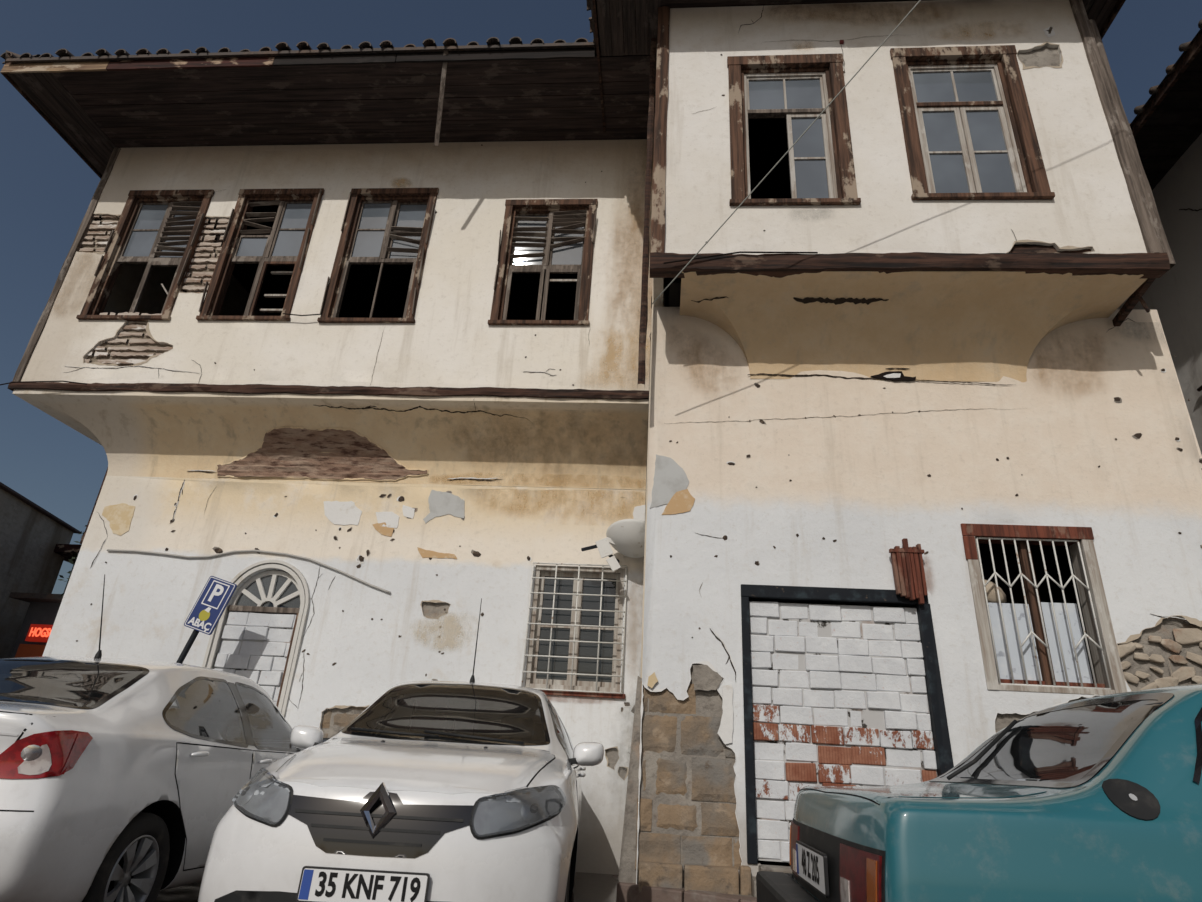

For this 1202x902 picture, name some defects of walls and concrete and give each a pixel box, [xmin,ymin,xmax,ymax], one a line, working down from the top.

flaking render [1017,26,1063,70]
crack [793,297,889,305]
crack [665,368,1012,424]
peeling [323,494,417,549]
peeling [662,489,695,515]
flaking render [1117,615,1202,691]
flaking render [320,705,369,738]
flaking render [995,711,1038,733]
flaking render [605,661,742,888]